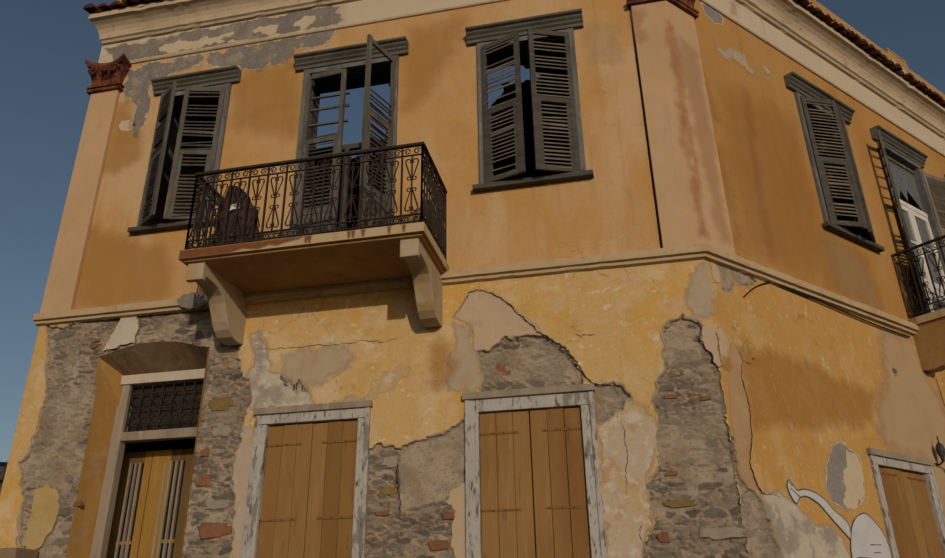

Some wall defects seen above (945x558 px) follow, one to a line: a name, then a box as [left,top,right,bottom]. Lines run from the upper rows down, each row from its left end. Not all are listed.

peeling [101,5,344,137]
peeling [715,47,771,75]
flaking render [15,291,352,558]
flaking render [365,419,466,558]
flaking render [446,262,850,558]
flaking render [825,441,865,511]